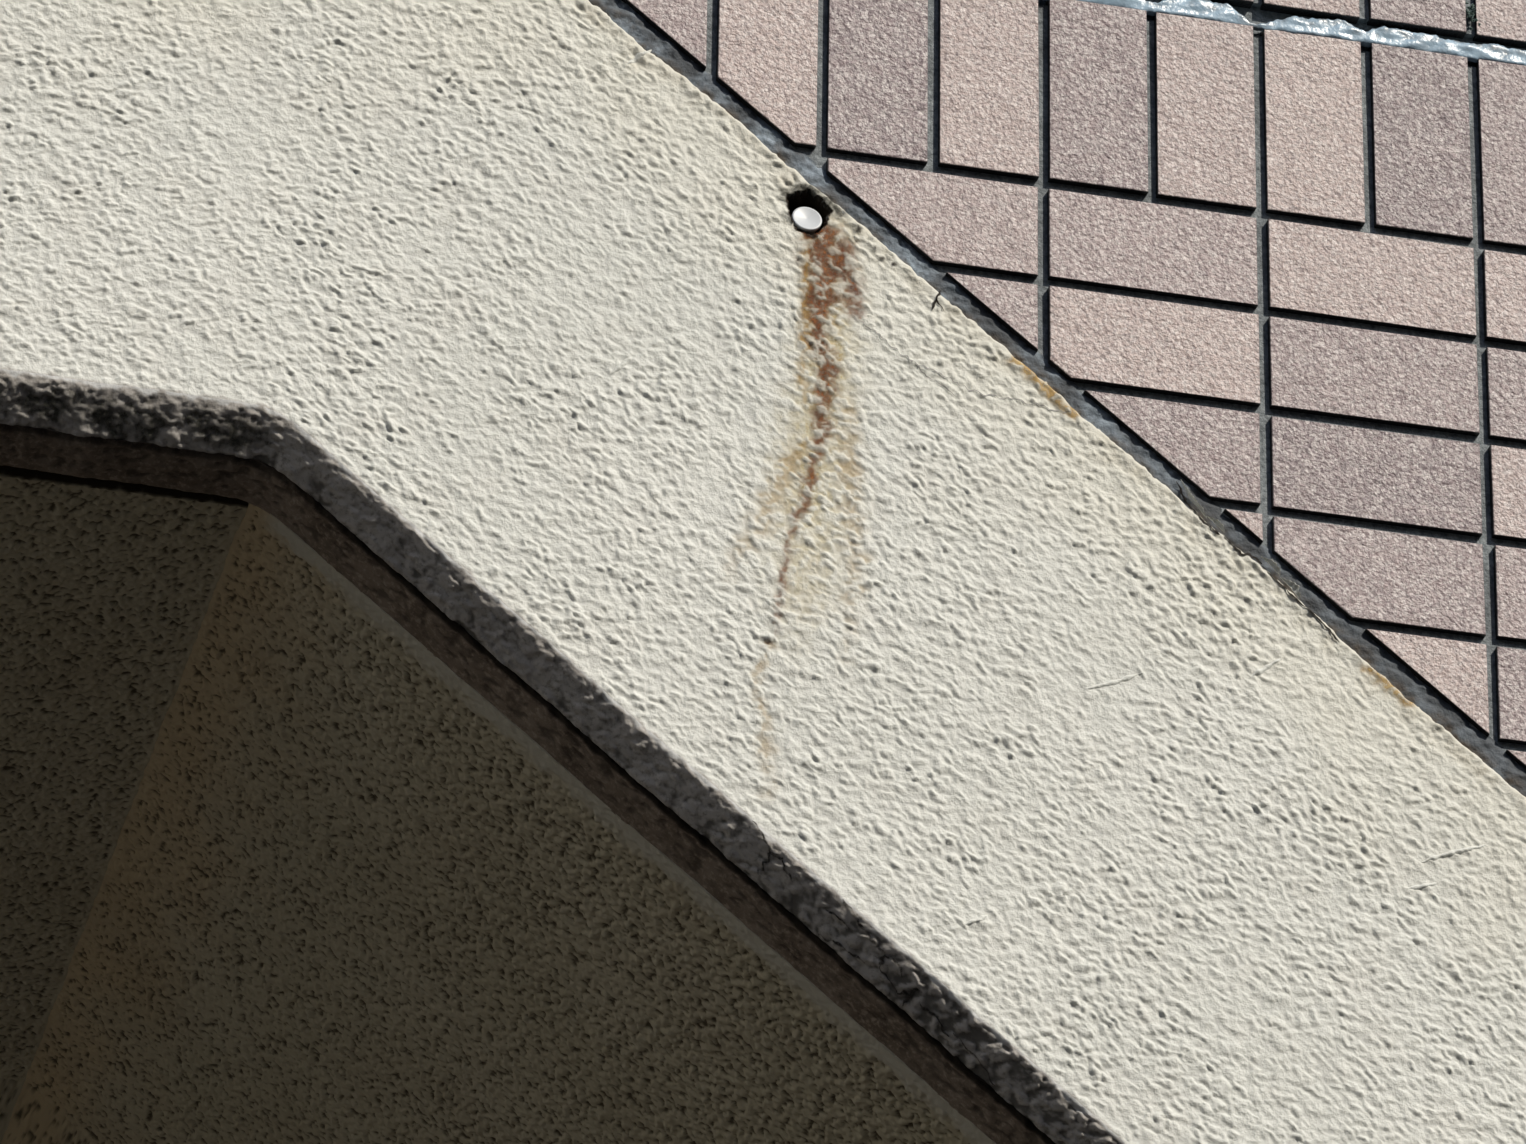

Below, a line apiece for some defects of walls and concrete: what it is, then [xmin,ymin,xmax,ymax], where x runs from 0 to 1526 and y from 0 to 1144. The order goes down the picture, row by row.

crack [932,290,944,311]
rust [791,226,861,532]
crack [851,314,1071,413]
crack [753,821,792,879]
crack [822,900,995,1086]